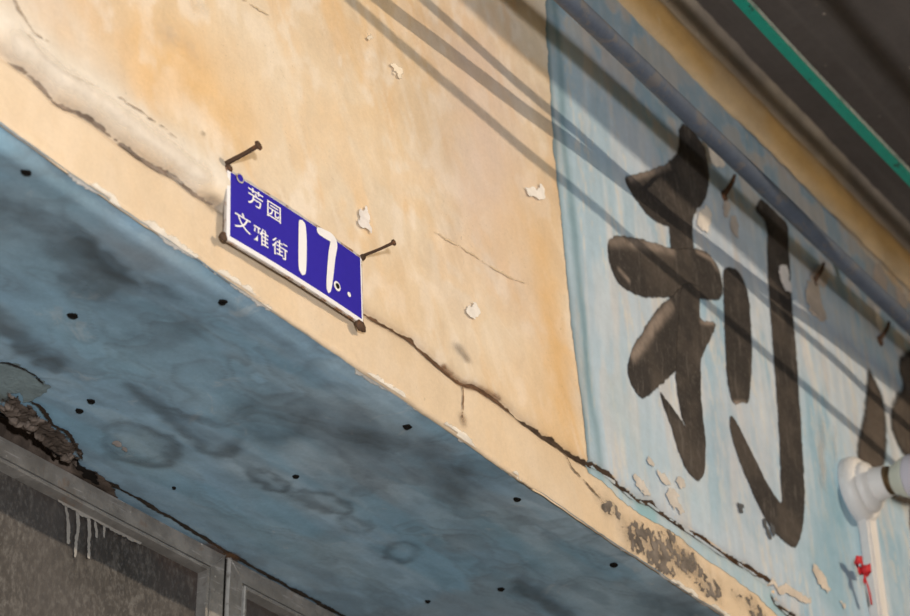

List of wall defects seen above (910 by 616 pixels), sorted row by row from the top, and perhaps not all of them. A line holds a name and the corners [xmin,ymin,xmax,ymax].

crack [14,0,54,46]
crack [9,63,213,205]
peeling [709,147,726,168]
peeling [525,183,545,200]
peeling [358,206,372,233]
peeling [697,205,712,233]
spalling [0,362,118,498]
crack [363,314,795,616]
damp [58,500,142,559]
peeling [763,518,775,539]
peeling [602,500,731,616]
peeling [813,564,831,593]